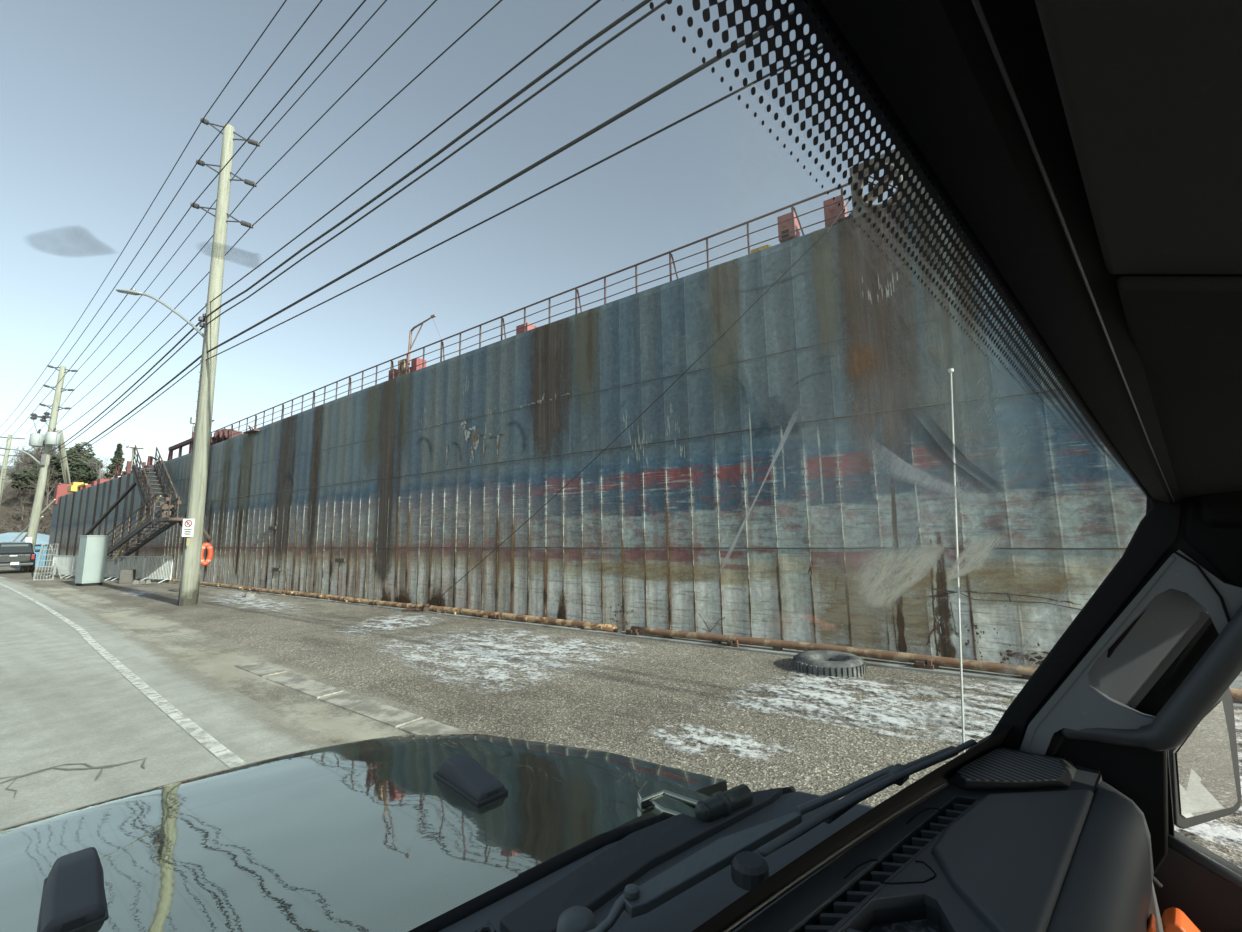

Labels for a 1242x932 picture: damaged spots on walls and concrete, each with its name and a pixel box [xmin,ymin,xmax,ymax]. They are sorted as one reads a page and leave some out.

corrosion [199,378,723,635]
peeling [461,419,504,463]
corrosion [531,307,596,457]
corrosion [708,259,738,396]
corrosion [838,194,990,477]